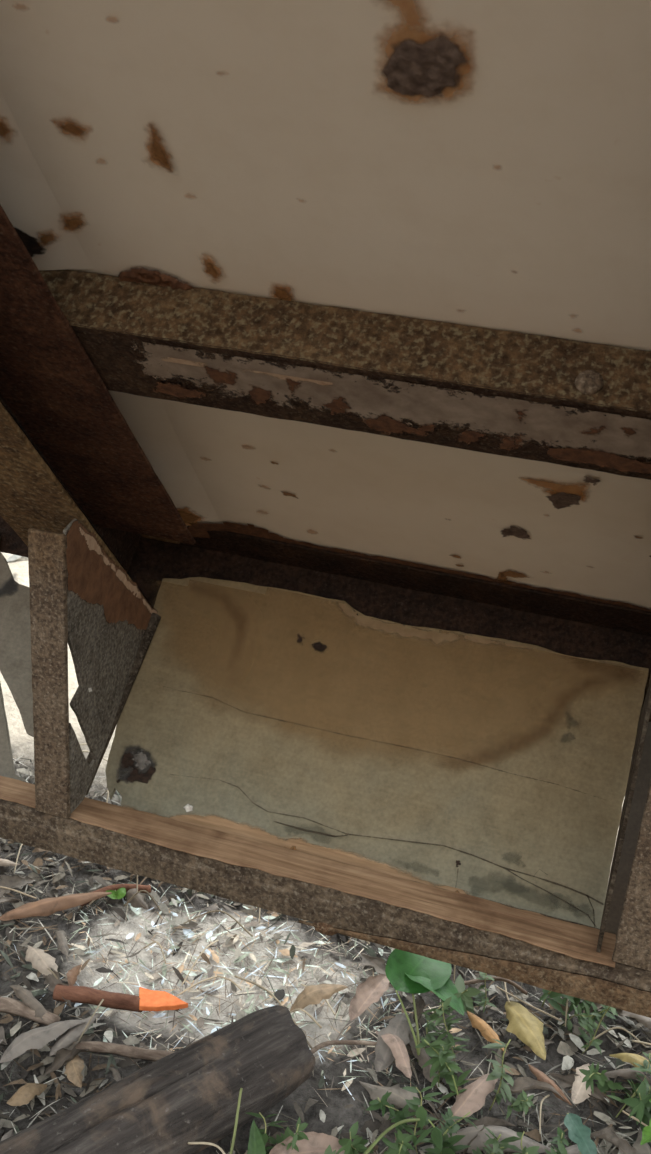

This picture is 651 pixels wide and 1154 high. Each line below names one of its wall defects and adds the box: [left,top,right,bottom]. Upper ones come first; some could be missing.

rust [379,0,473,103]